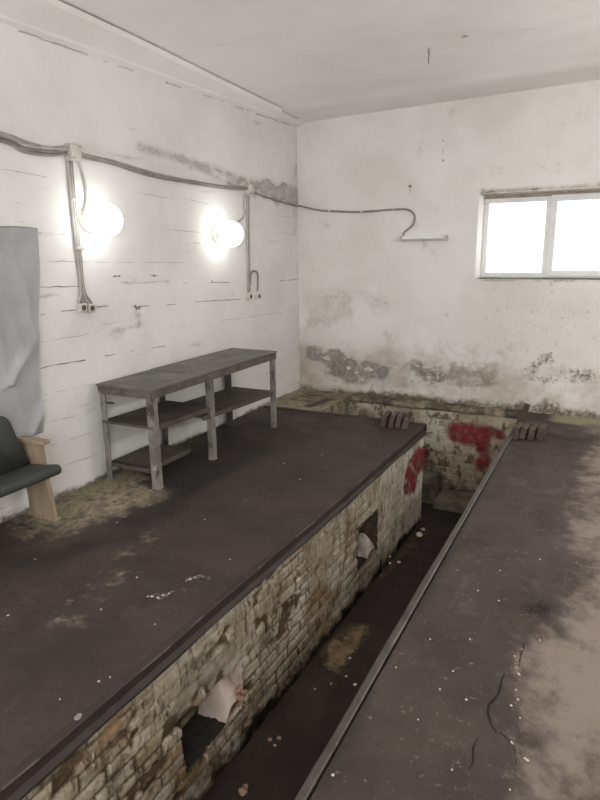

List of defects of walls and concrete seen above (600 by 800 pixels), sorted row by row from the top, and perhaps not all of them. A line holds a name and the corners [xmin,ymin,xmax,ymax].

damp [307,347,389,393]
damp [411,360,494,384]
damp [538,399,597,417]
spalling [22,402,518,800]
crack [468,642,525,771]